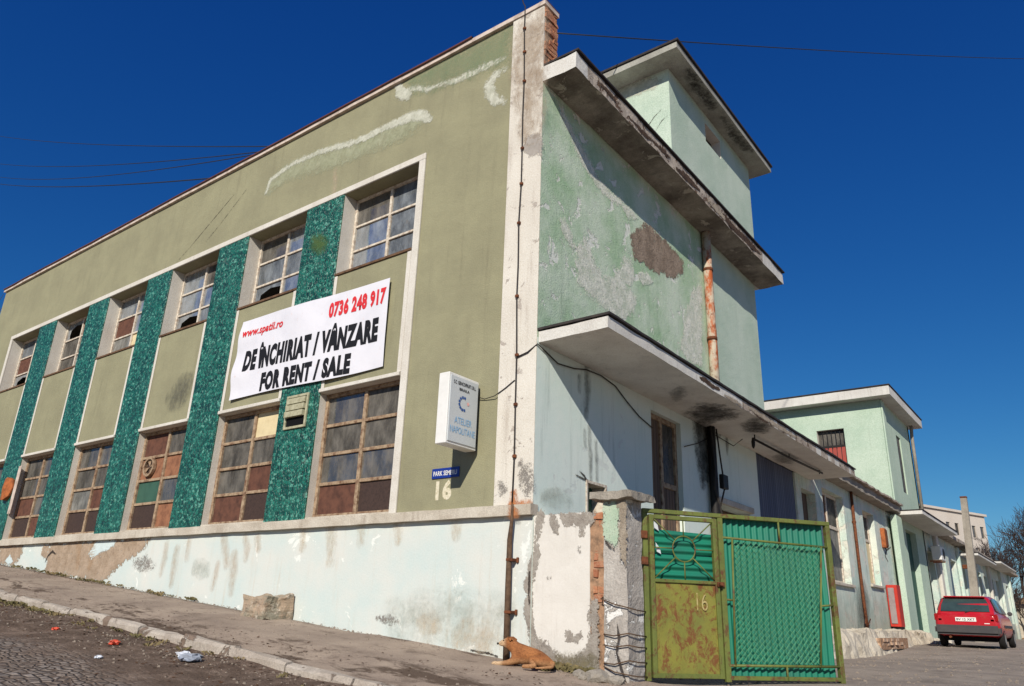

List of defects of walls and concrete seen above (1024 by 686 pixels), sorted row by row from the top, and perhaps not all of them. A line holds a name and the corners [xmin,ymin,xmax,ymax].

peeling [599,77,660,102]
peeling [551,89,685,318]
spalling [628,115,761,255]
water stain [690,405,768,483]
flaking render [41,538,154,581]
spalling [523,499,628,669]